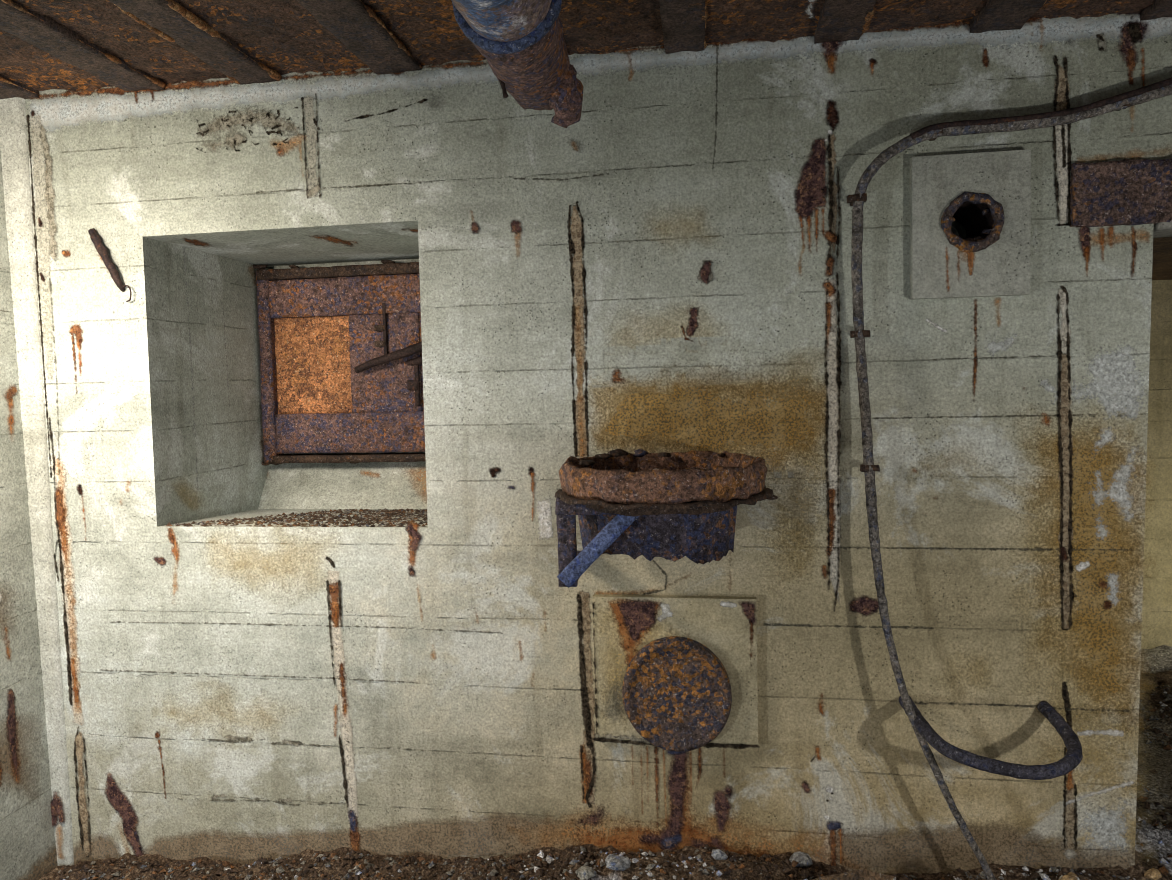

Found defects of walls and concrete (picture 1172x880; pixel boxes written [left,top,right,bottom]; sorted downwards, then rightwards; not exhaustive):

corrosion [0,39,241,116]
corrosion [166,0,403,81]
spalling [196,107,300,153]
corrosion [795,100,839,272]
corrosion [69,325,82,394]
corrosion [55,489,65,533]
corrosion [406,523,421,577]
leakage [1040,345,1144,714]
corrosion [0,689,20,786]
corrosion [105,774,144,857]
corrosion [632,746,702,851]
corrosion [711,753,732,850]